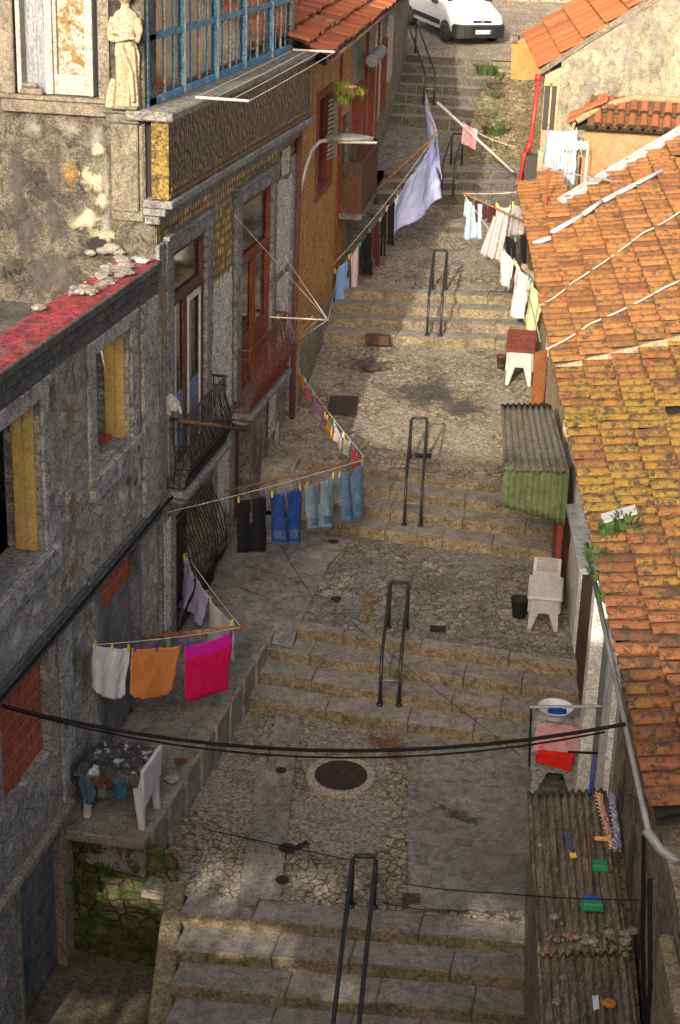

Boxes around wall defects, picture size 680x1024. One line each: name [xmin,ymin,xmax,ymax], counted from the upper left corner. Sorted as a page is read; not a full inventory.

flaking render [92,141,104,156]
spalling [69,167,126,256]